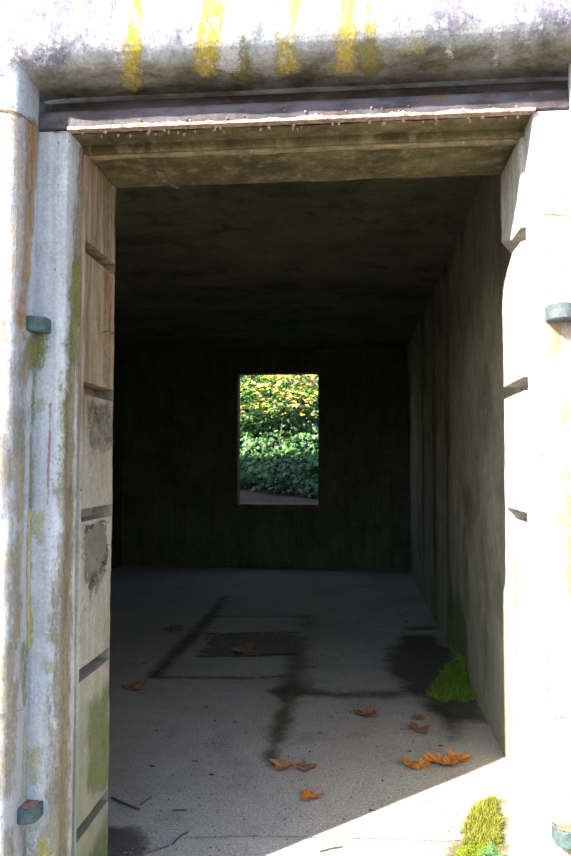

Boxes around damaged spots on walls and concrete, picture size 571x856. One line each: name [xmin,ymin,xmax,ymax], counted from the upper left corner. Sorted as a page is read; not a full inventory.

water stain [149,596,486,760]